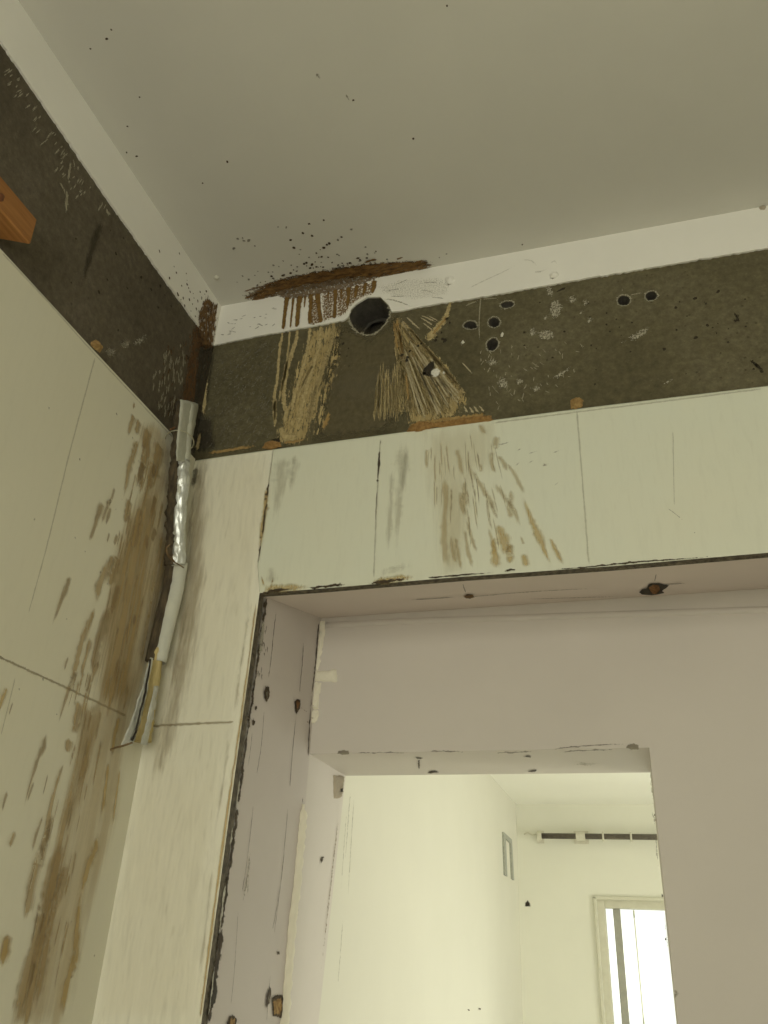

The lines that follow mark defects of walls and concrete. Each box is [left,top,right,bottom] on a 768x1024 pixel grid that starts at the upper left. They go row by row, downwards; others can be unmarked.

corrosion [237,223,447,329]
spalling [400,300,515,362]
spalling [422,361,445,377]
crack [374,442,382,517]
water stain [16,404,165,1024]
water stain [1,936,10,964]